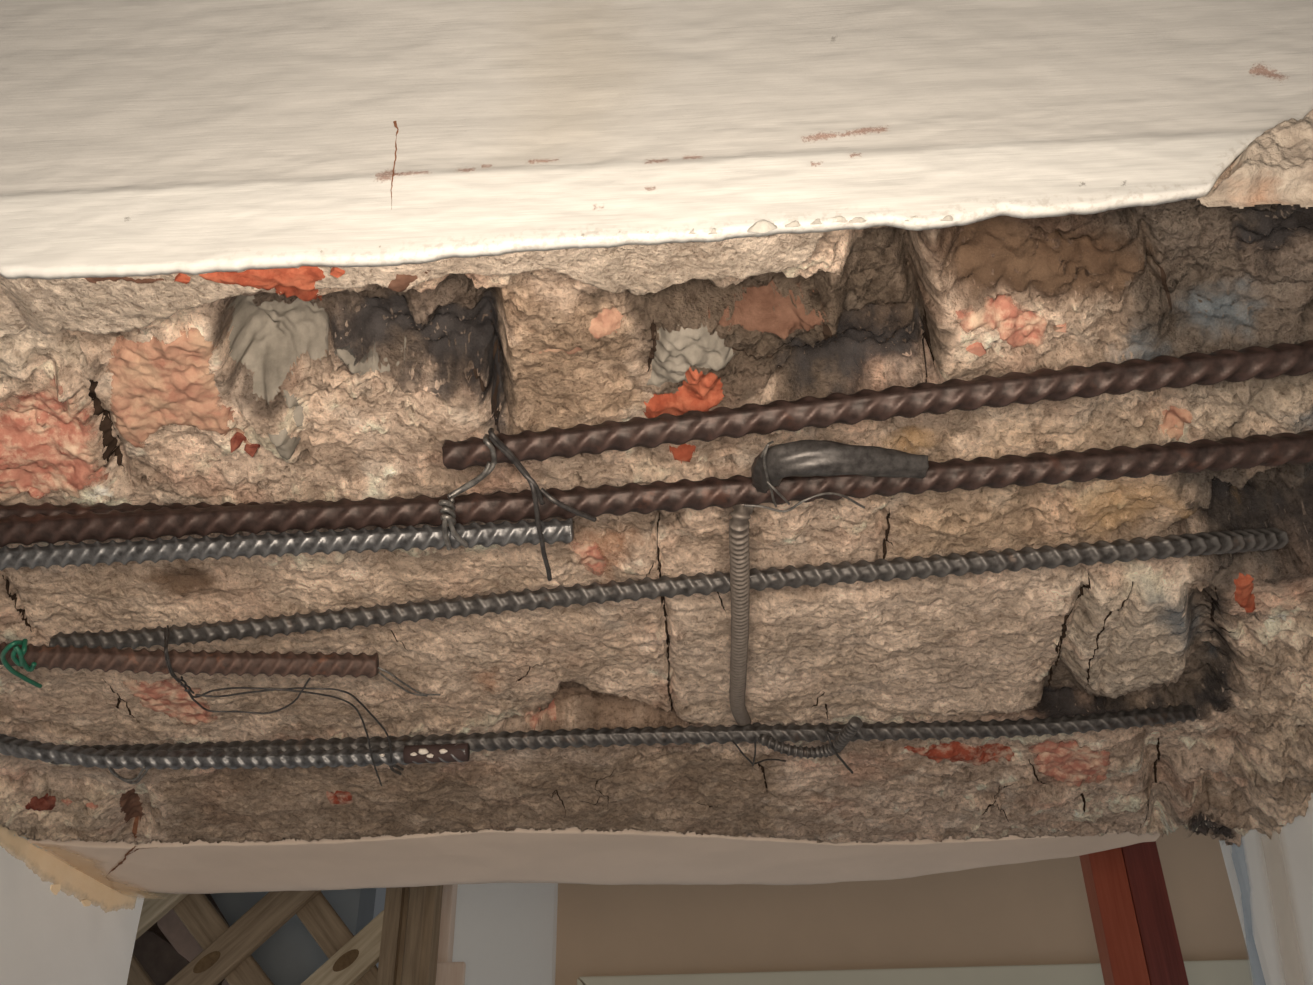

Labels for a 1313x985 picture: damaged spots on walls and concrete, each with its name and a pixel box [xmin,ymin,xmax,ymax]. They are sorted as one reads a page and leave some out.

spalling [0,374,109,501]
crack [88,379,126,472]
spalling [106,328,260,458]
spalling [85,250,345,302]
water stain [332,290,506,433]
spalling [643,368,724,418]
spalling [705,277,828,340]
spalling [954,294,1066,357]
crack [646,512,673,711]
crack [1030,573,1133,710]
spalling [122,678,219,725]
peeling [0,824,137,912]